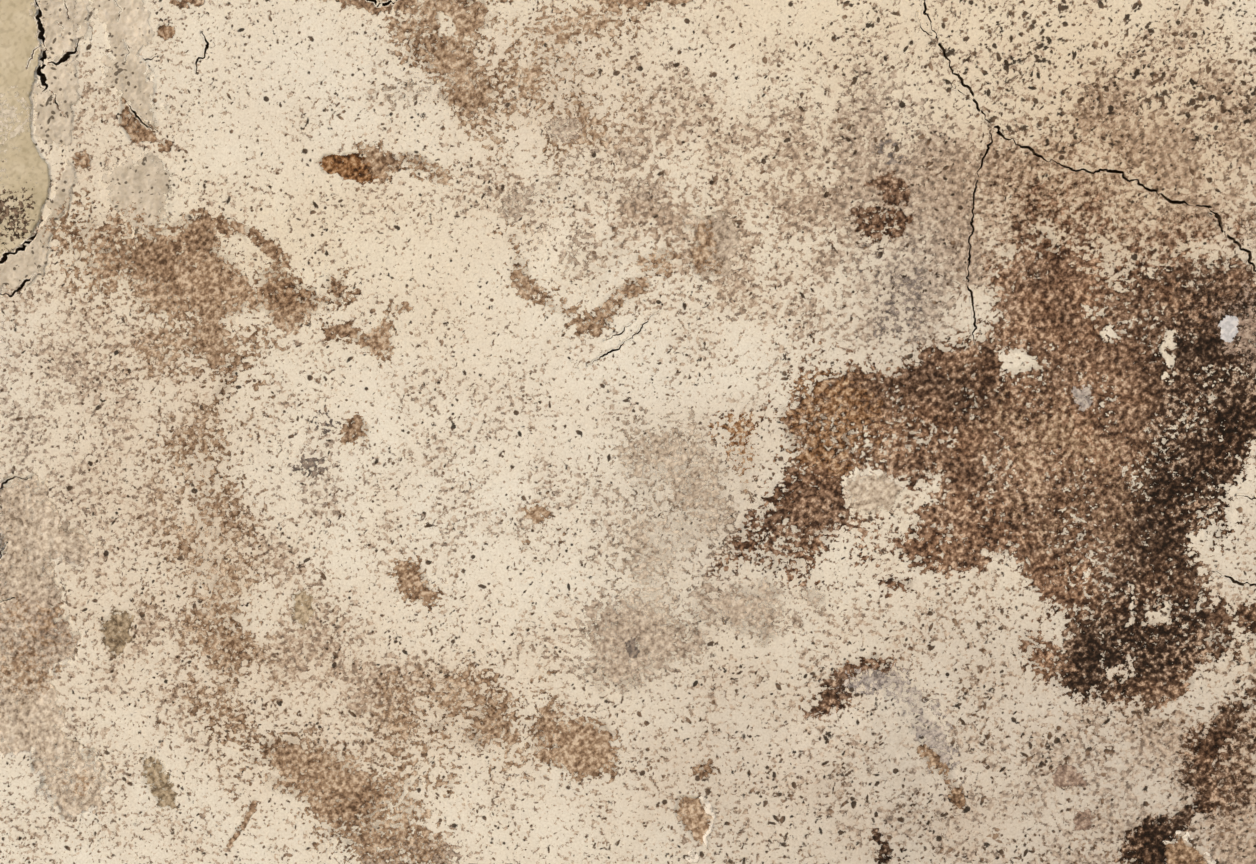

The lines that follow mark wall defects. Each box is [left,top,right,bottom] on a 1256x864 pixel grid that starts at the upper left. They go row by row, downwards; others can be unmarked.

crack [295,0,527,15]
crack [598,0,693,13]
crack [56,0,158,63]
crack [169,0,211,73]
crack [48,89,66,118]
crack [125,102,158,133]
crack [916,0,1256,344]
spalling [0,187,36,251]
crack [0,474,31,490]
damp [38,188,830,864]
crack [0,543,8,560]